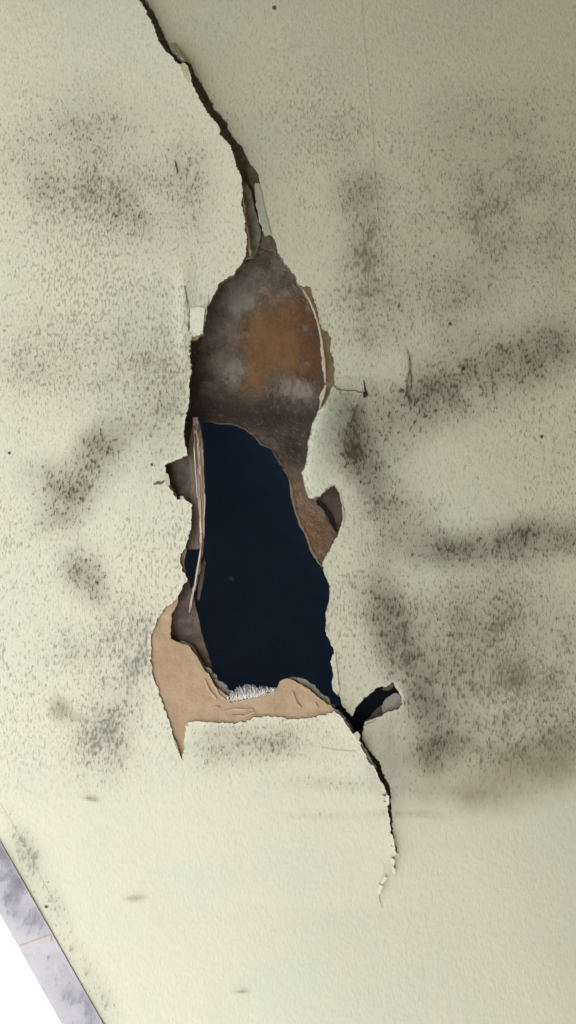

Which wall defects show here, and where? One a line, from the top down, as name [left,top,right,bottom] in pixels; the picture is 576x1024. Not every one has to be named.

mould [45,150,142,226]
crack [140,0,271,260]
rust [299,301,322,384]
mould [341,179,393,350]
mould [453,157,570,272]
mould [41,428,119,524]
mould [65,548,105,599]
peeling [150,233,345,758]
mould [331,318,576,568]
mould [77,617,151,772]
mould [361,581,576,772]
crack [321,708,396,906]